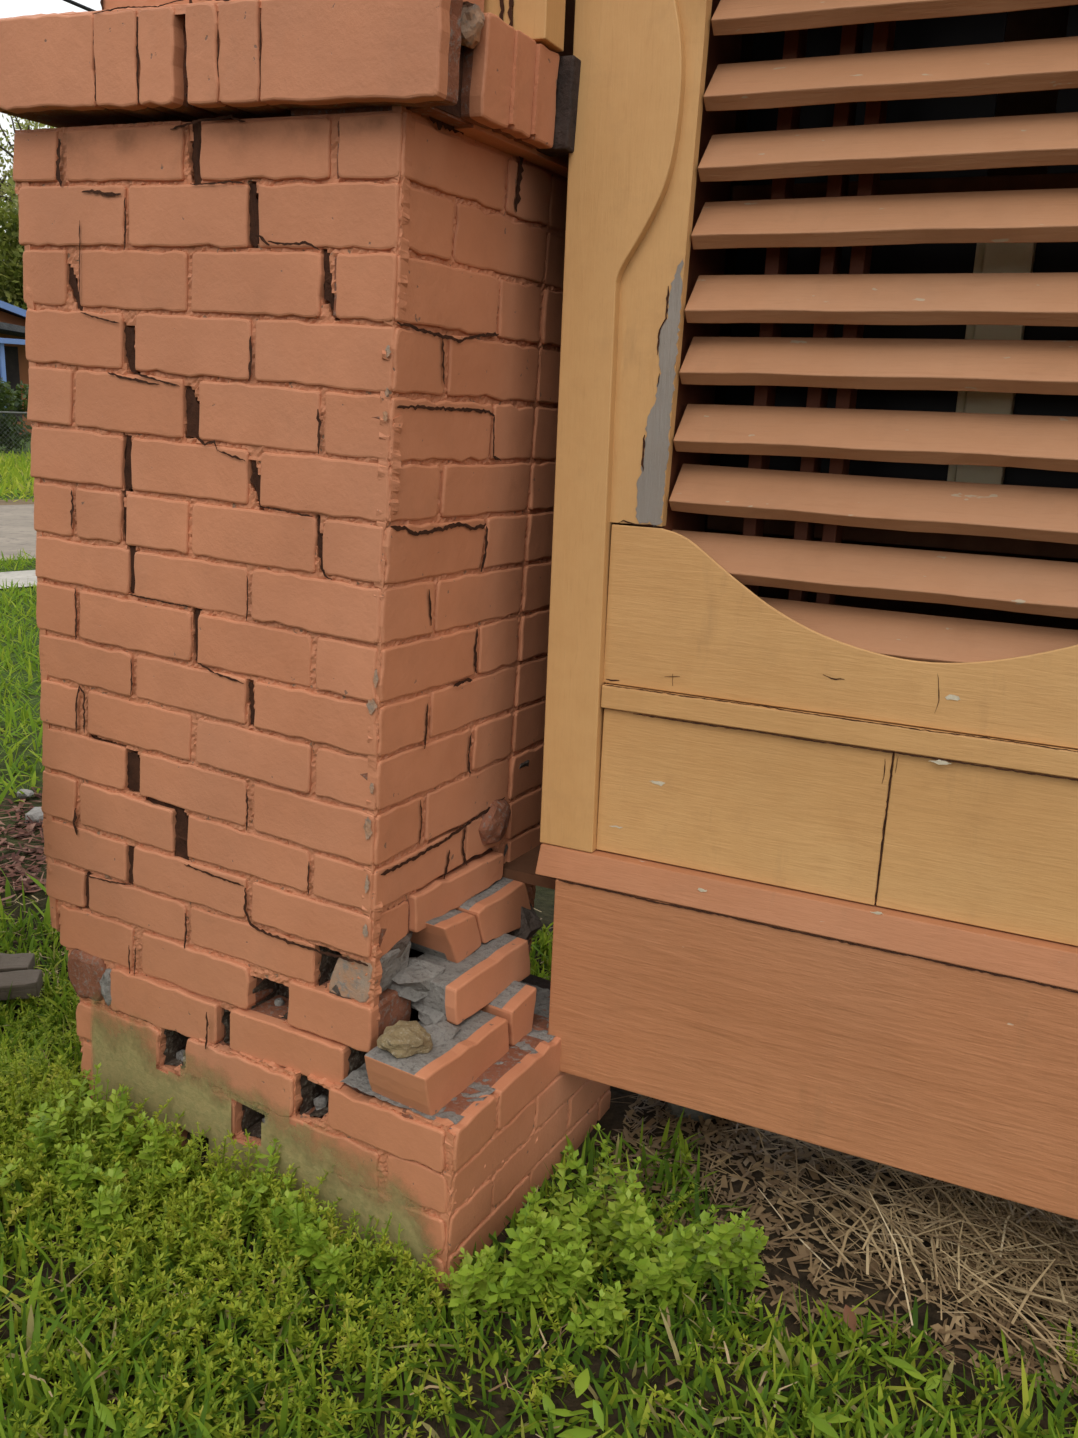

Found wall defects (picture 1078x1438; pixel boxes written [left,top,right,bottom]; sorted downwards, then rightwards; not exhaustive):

crack [93,0,340,320]
crack [56,139,332,580]
crack [397,321,501,461]
peeling [617,259,684,526]
crack [123,436,255,725]
crack [75,686,368,966]
crack [381,797,505,879]
peeling [319,946,341,987]
peeling [163,1029,190,1069]
peeling [241,1105,269,1139]
peeling [299,1074,329,1117]
peeling [348,1046,368,1075]